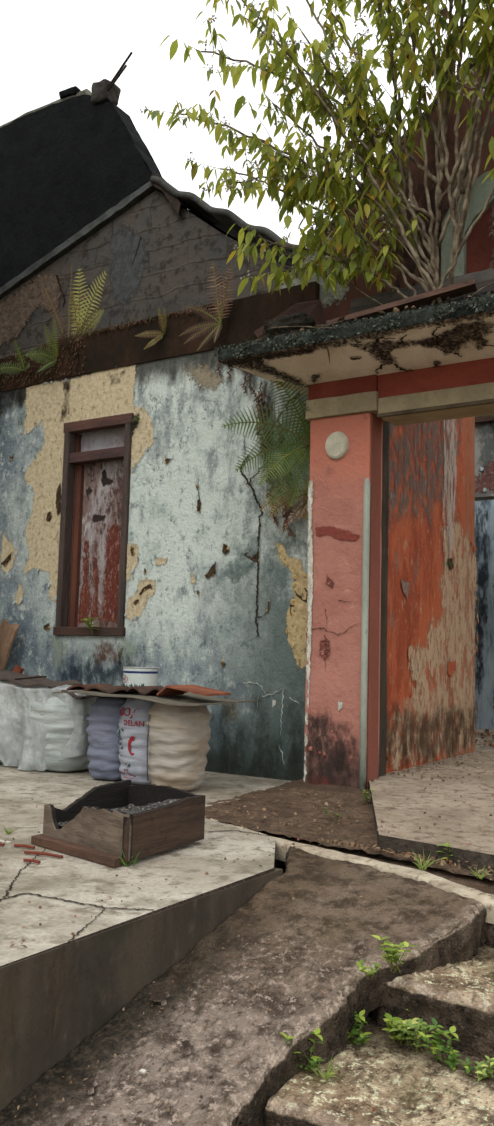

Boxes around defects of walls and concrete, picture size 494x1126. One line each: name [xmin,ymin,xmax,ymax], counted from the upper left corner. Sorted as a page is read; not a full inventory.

spalling [0,270,64,346]
peeling [0,365,167,625]
spalling [190,543,230,596]
peeling [275,478,360,782]
leakage [221,309,494,444]
peeling [386,519,479,771]
leakage [387,500,491,765]
peeling [475,461,494,494]